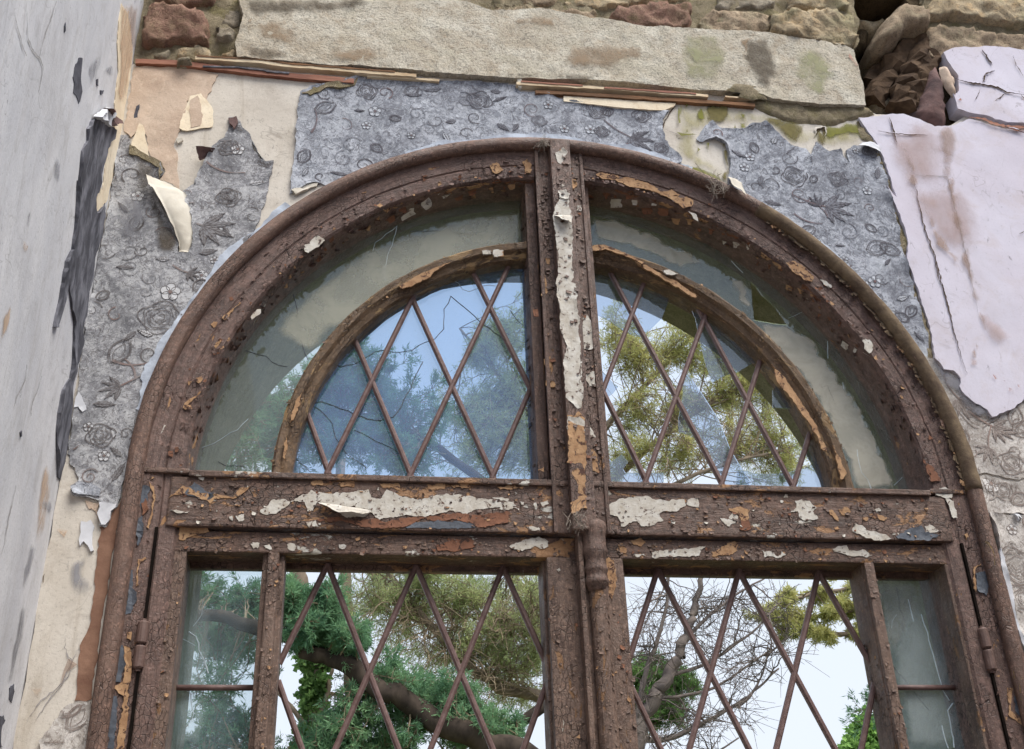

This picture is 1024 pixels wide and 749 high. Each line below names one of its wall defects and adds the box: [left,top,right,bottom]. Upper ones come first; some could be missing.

peeling [52,0,242,480]
peeling [107,147,990,749]
flaking render [460,0,1024,418]
water stain [935,232,969,266]
crack [956,50,1024,133]